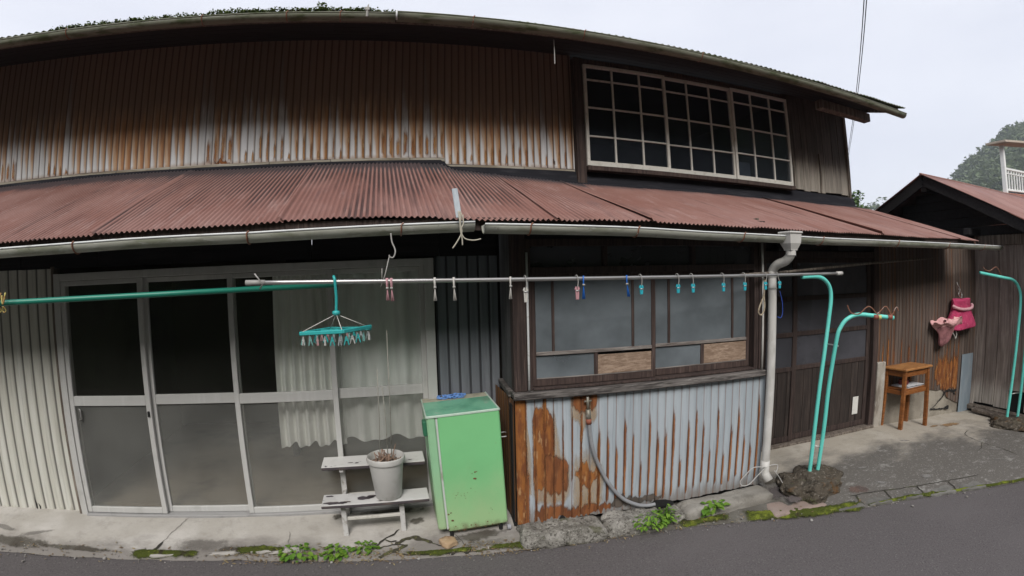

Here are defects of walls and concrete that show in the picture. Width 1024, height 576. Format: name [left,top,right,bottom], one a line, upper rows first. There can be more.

rust [206,133,232,164]
rust [882,339,959,390]
rust [515,394,760,525]